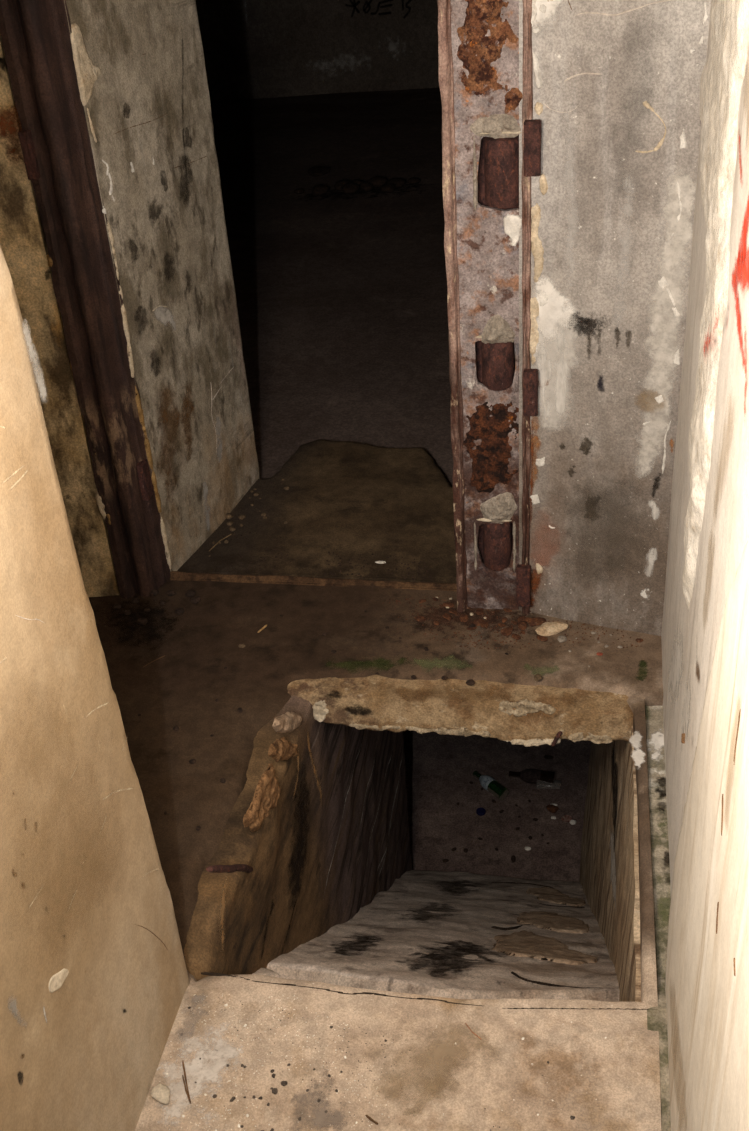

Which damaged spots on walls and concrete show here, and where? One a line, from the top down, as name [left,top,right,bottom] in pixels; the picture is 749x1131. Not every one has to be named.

flaking render [70,23,101,142]
damp [161,40,192,202]
corrosion [457,0,523,114]
damp [148,201,162,223]
damp [164,253,191,293]
damp [150,351,160,377]
corrosion [463,402,540,521]